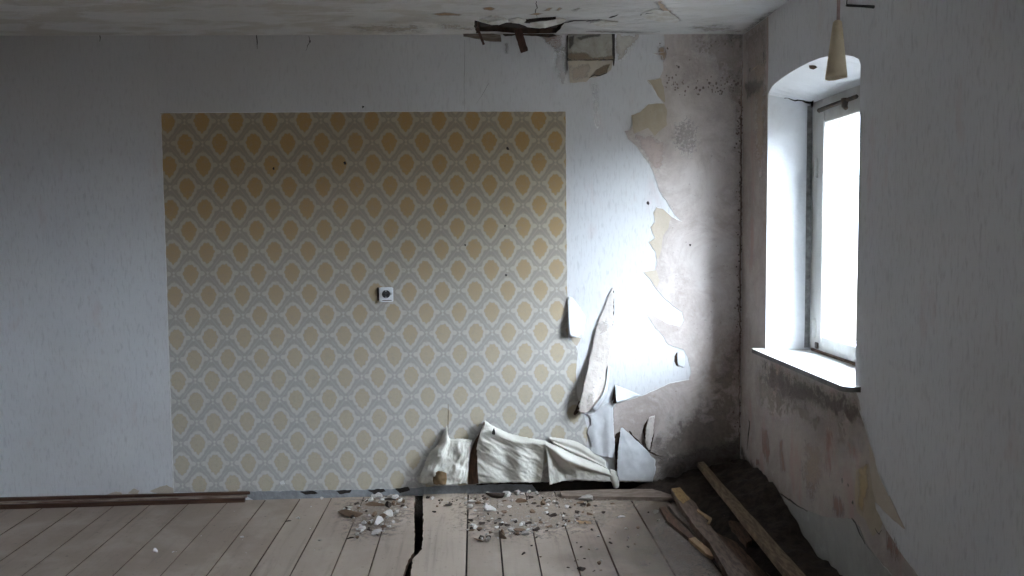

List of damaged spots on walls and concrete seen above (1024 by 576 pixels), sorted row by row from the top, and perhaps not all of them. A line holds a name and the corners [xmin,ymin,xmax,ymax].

peeling [247,15,919,576]
leakage [654,28,765,481]
leakage [760,362,858,443]